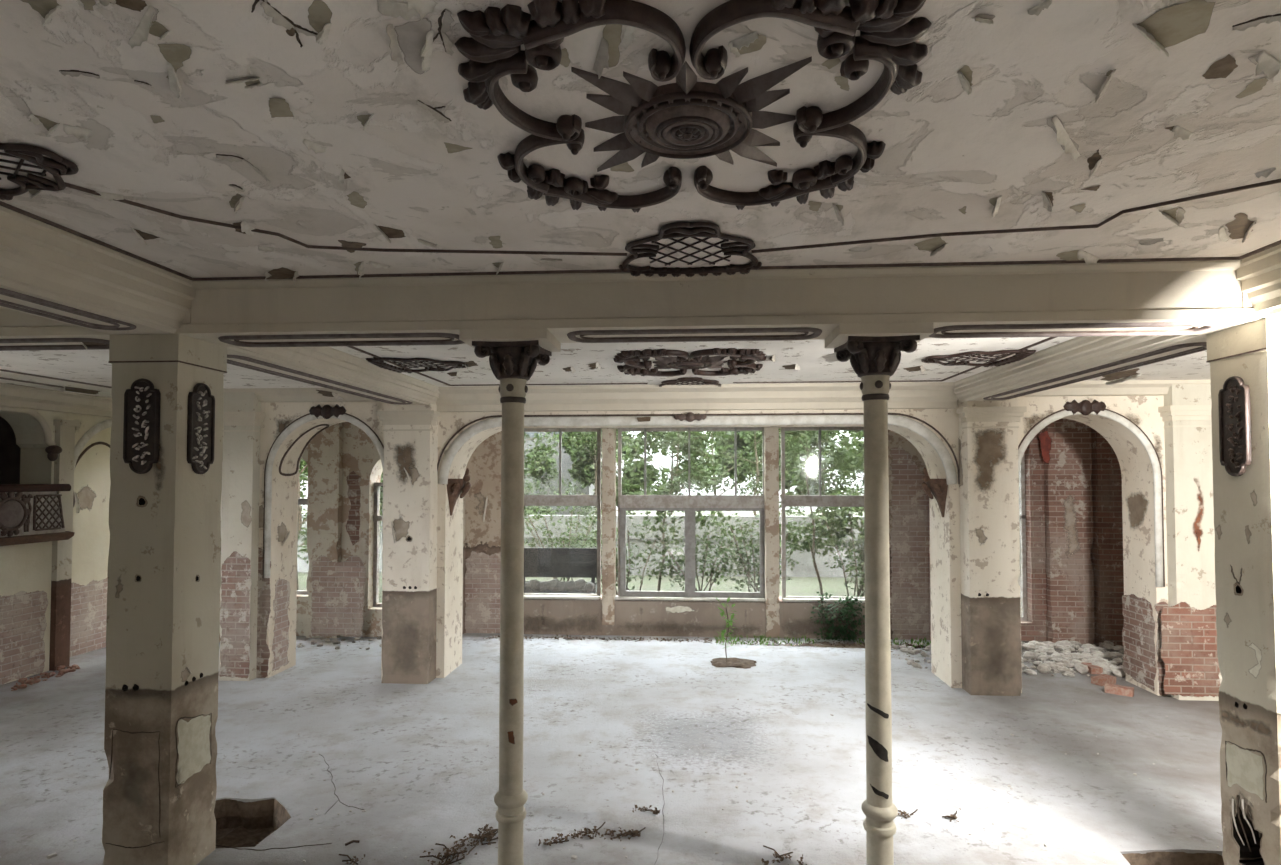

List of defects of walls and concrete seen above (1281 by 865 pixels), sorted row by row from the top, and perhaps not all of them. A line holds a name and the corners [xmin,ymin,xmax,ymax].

peeling [80,0,191,99]
peeling [286,0,332,45]
peeling [1132,0,1215,57]
peeling [1202,51,1281,98]
peeling [1047,115,1103,213]
peeling [374,224,437,248]
peeling [1218,213,1256,243]
spalling [311,471,367,637]
spalling [219,547,290,678]
spalling [1122,594,1231,697]
crack [216,754,364,851]
spalling [1122,793,1265,865]